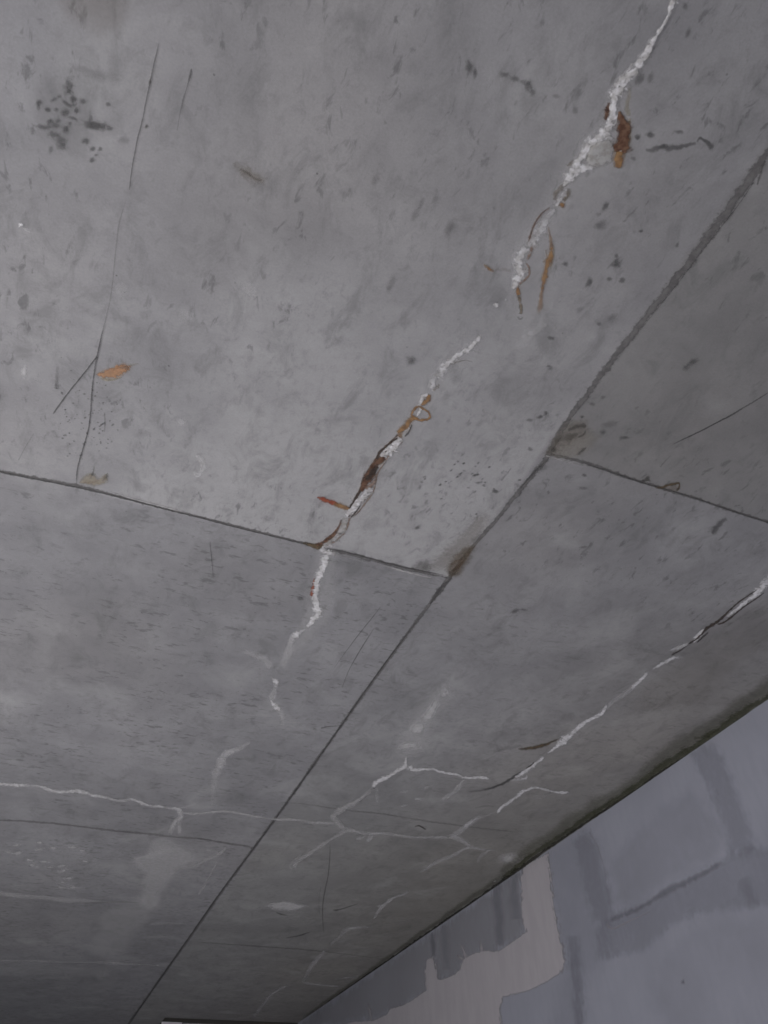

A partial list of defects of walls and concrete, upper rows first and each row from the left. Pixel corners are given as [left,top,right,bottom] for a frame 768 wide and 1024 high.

crack [495,0,678,314]
corrosion [317,497,350,510]
crack [291,336,481,640]
crack [631,576,768,689]
crack [0,782,106,798]
crack [132,799,181,812]
crack [372,706,607,827]
crack [503,854,519,863]